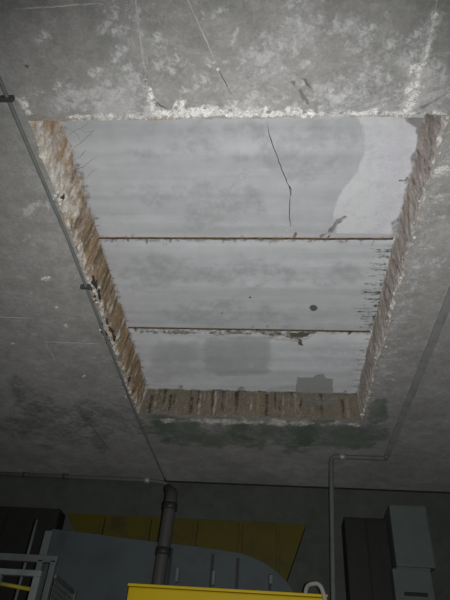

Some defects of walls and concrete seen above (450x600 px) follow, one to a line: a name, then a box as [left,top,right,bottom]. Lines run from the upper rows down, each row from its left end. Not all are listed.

leakage [17,97,79,231]
leakage [50,0,450,423]
crack [268,128,294,231]
spalling [90,276,101,304]
rust [31,113,450,420]
peeling [258,331,316,346]
leakage [190,417,339,444]